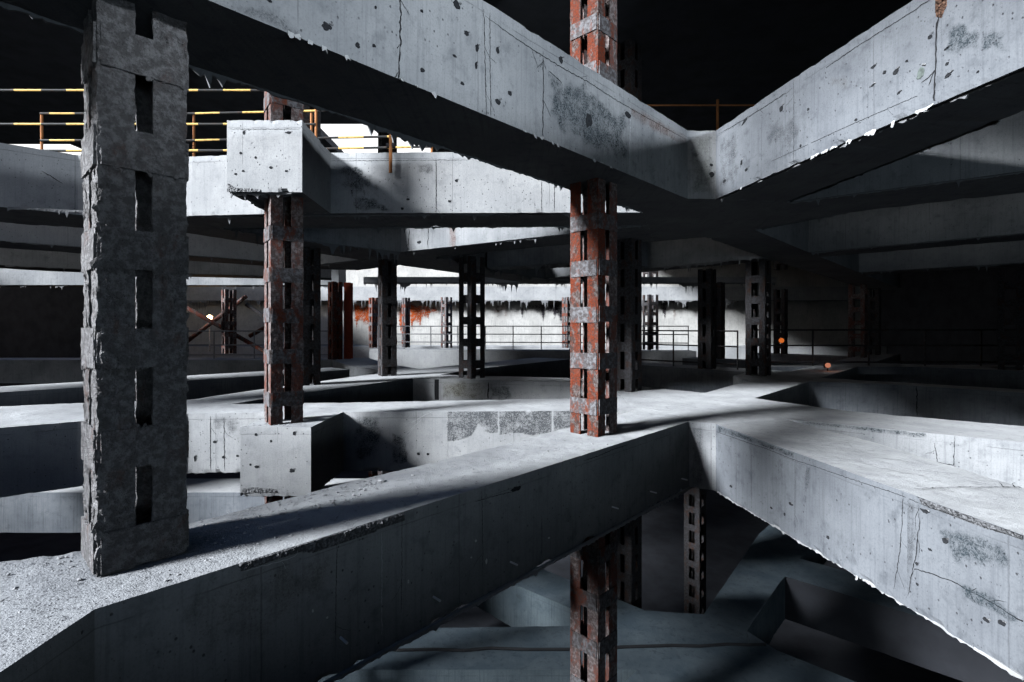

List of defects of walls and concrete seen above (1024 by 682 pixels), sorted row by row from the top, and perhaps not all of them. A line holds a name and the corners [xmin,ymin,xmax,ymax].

spalling [935,0,947,18]
crack [396,0,409,77]
leakage [948,25,1001,49]
crack [721,0,939,160]
leakage [551,79,627,158]
corrosion [354,305,369,324]
corrosion [399,304,436,330]
peeling [447,411,570,441]
crack [718,432,1023,622]
leakage [943,533,1006,562]